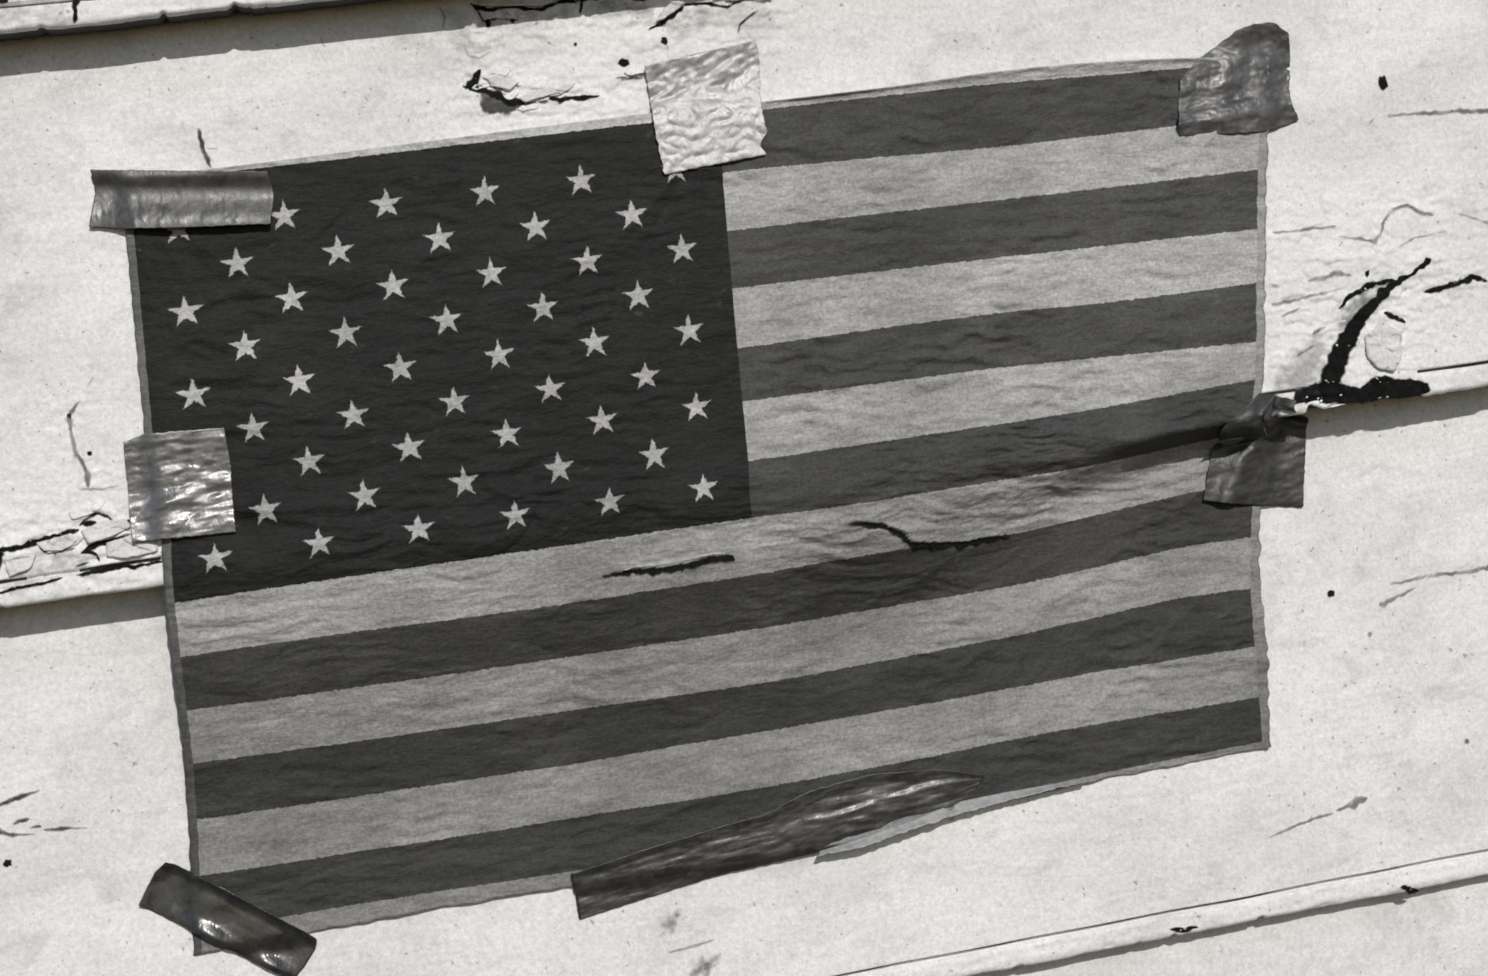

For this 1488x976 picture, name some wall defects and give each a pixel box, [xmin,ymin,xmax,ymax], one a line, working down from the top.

crack [470,0,587,46]
crack [640,0,767,44]
crack [1282,204,1487,404]
crack [0,529,162,594]